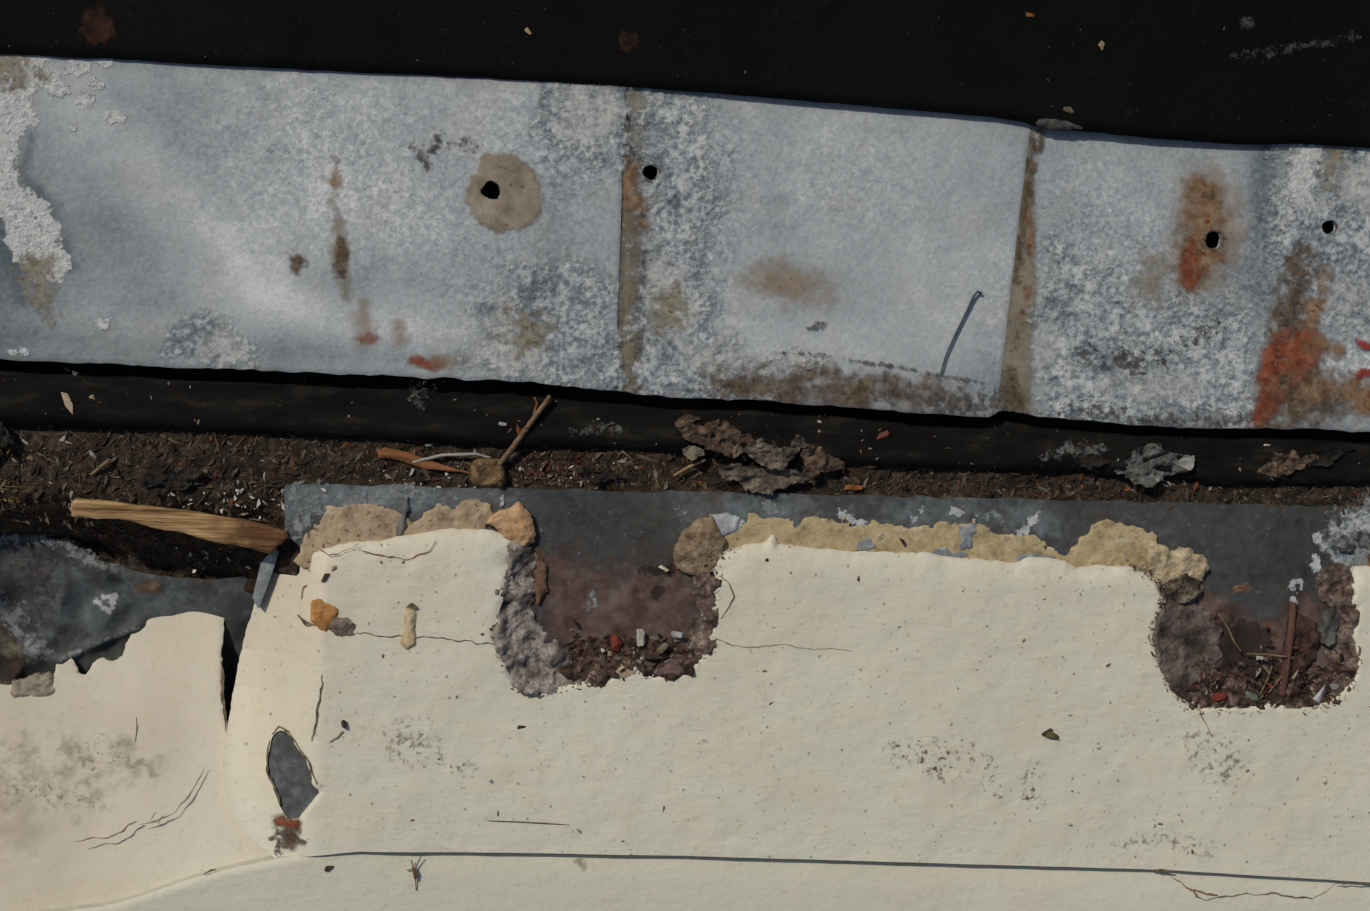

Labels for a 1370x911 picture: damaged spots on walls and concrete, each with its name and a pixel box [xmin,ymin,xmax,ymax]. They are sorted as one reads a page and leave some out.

leakage [0,54,126,330]
corrosion [408,133,543,233]
corrosion [621,87,651,228]
corrosion [1178,173,1237,290]
leakage [8,347,29,356]
corrosion [1250,242,1370,428]
spalling [293,496,1370,710]
peeling [10,671,55,698]
crack [1153,869,1370,901]